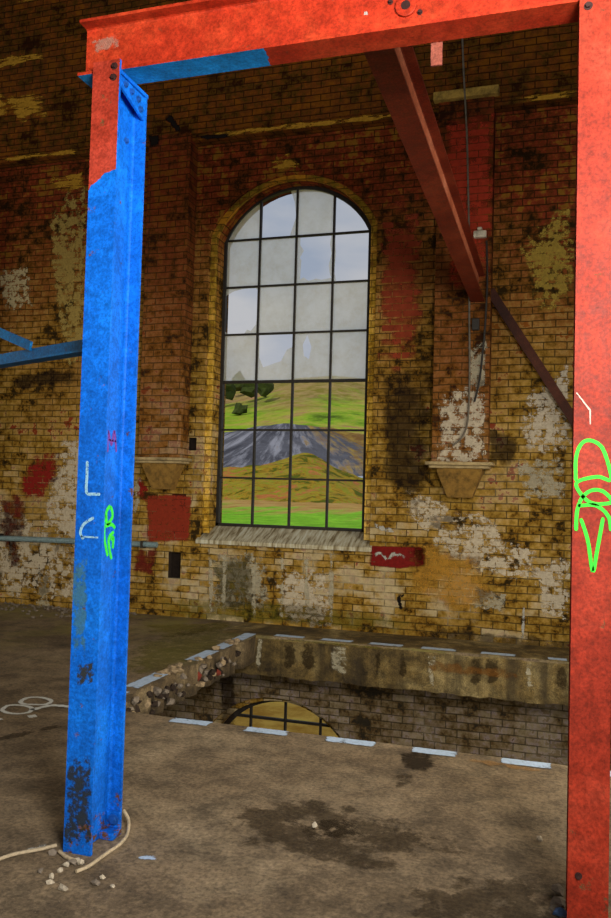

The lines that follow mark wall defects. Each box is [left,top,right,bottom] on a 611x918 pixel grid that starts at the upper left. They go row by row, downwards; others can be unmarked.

peeling [0,453,59,568]
water stain [384,343,572,620]
flaking render [370,544,491,609]
spalling [125,638,241,715]
water stain [284,644,316,669]
water stain [331,647,346,673]
water stain [470,659,498,684]
rust [64,757,91,843]